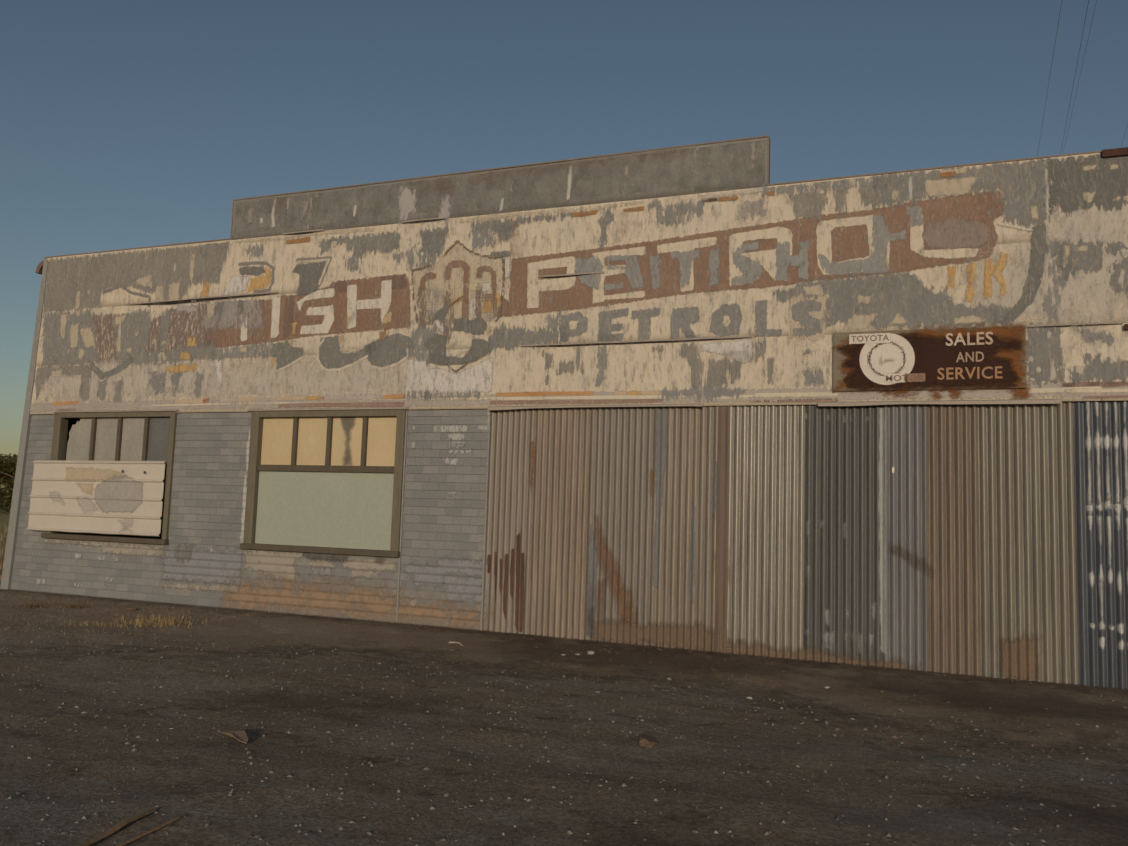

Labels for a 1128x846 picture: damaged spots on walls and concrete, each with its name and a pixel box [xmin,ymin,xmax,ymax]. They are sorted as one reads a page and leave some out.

peeling [319,154,1128,273]
peeling [34,241,273,403]
peeling [433,410,491,466]
peeling [488,310,607,387]
peeling [652,337,775,403]
peeling [803,349,824,386]
peeling [773,271,1012,335]
rust [1011,388,1030,399]
peeling [1026,238,1128,388]
peeling [45,429,487,612]
rust [487,533,525,632]
rust [596,519,637,624]